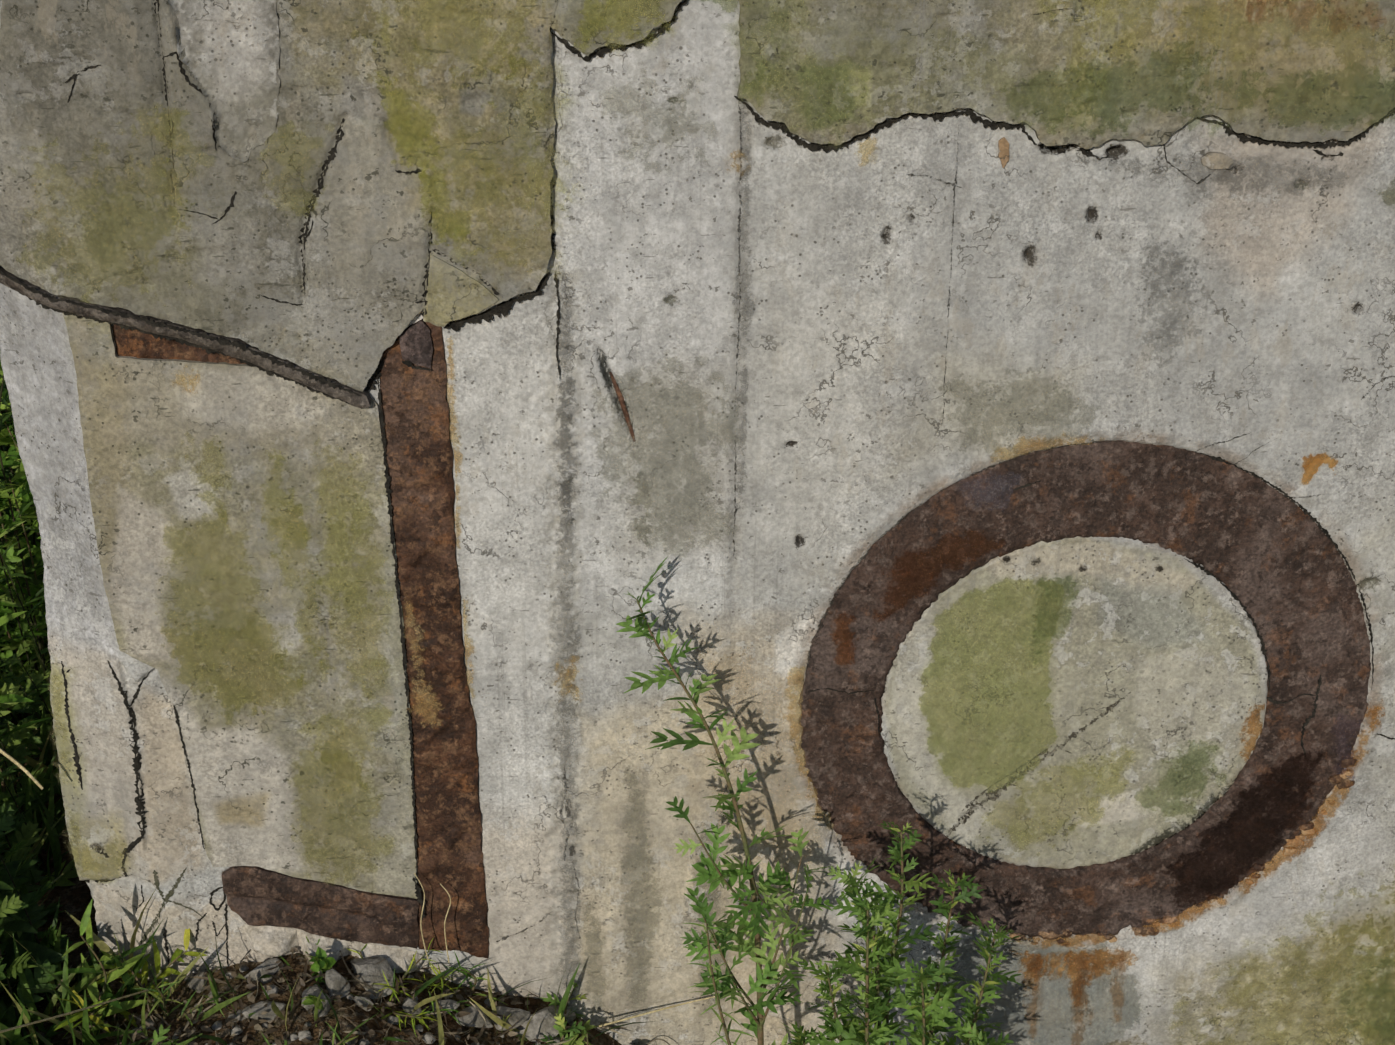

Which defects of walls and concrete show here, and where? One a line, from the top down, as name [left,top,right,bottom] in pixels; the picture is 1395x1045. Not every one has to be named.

crack [154,0,237,224]
flaking render [737,0,1395,168]
flaking render [0,0,682,392]
crack [395,167,421,175]
spalling [1024,245,1034,266]
spalling [601,360,636,442]
rust [1305,458,1334,480]
crack [0,173,561,965]
crack [947,692,1131,837]
rust [1282,757,1357,856]
rust [1245,863,1265,885]
rust [1131,916,1180,937]